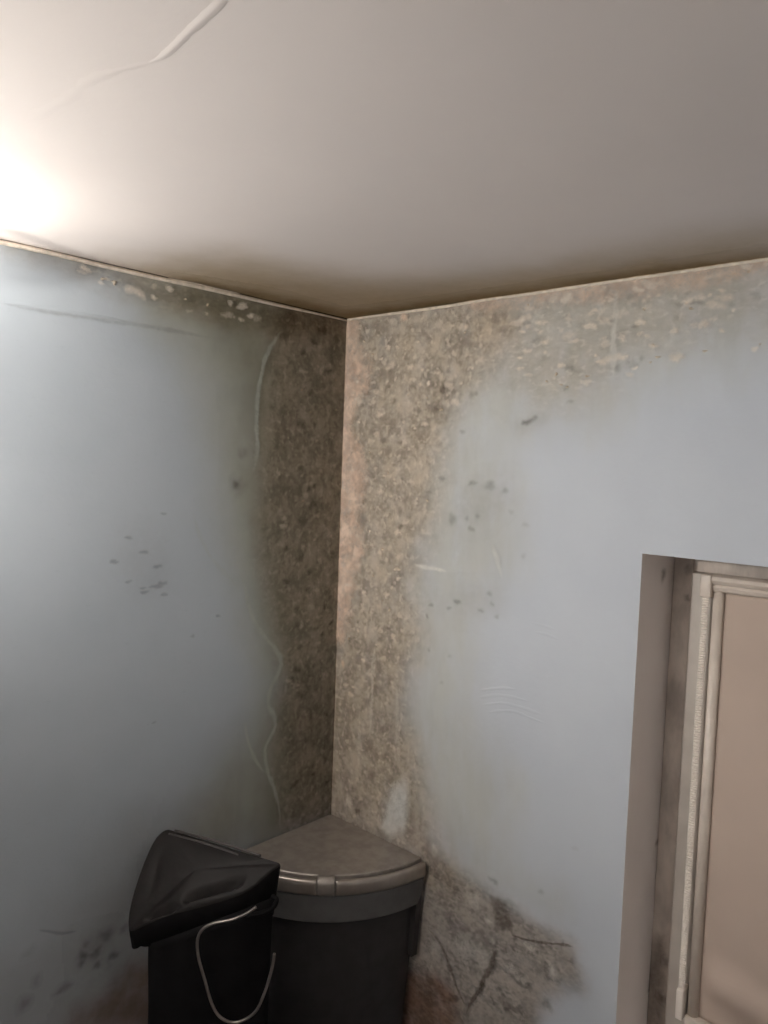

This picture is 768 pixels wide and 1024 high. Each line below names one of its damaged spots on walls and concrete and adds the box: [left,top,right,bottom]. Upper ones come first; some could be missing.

damp [457,258,768,377]
damp [427,892,574,1009]